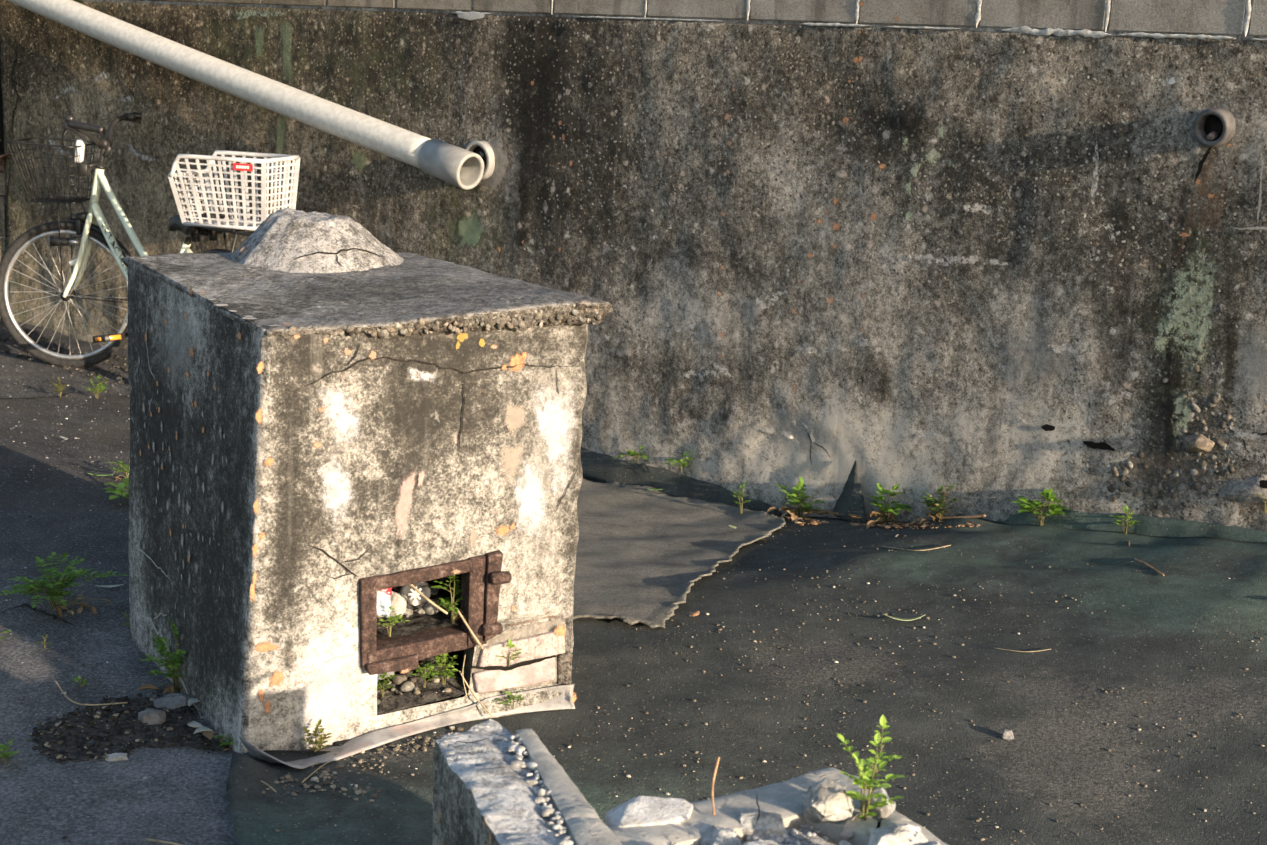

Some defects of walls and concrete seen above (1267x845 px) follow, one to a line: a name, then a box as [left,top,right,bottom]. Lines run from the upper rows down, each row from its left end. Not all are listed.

damp [516,80,565,246]
crack [291,248,386,267]
damp [1154,254,1217,447]
peeling [395,471,424,537]